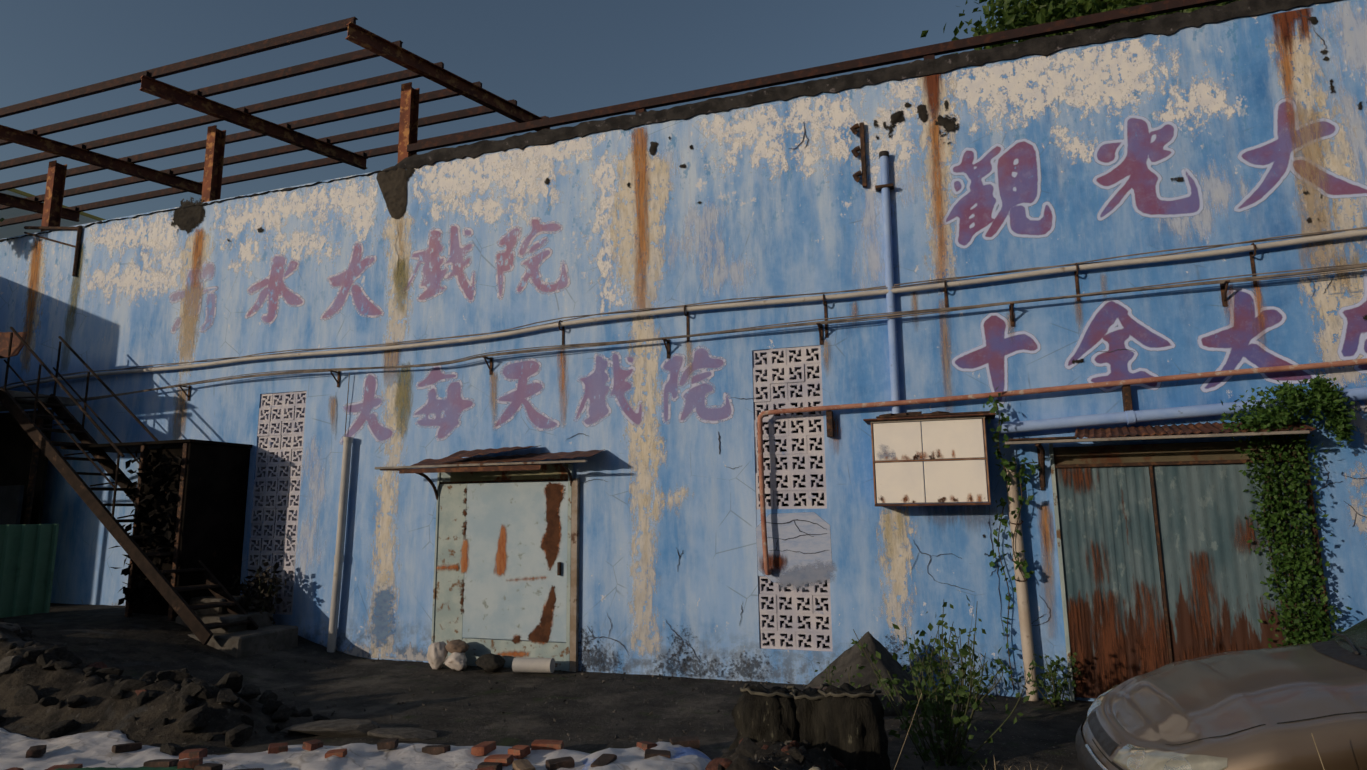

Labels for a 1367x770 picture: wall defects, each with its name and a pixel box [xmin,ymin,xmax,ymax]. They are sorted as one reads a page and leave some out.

corrosion [20,239,46,368]
peeling [79,134,636,322]
leakage [383,212,413,345]
corrosion [607,127,679,655]
crack [760,519,827,554]
leakage [876,506,963,688]
corrosion [913,74,959,378]
peeling [649,36,1247,293]
corrosion [1067,543,1255,694]
corrosion [1266,8,1367,274]
leakage [1300,254,1367,387]
peeling [1344,400,1367,533]